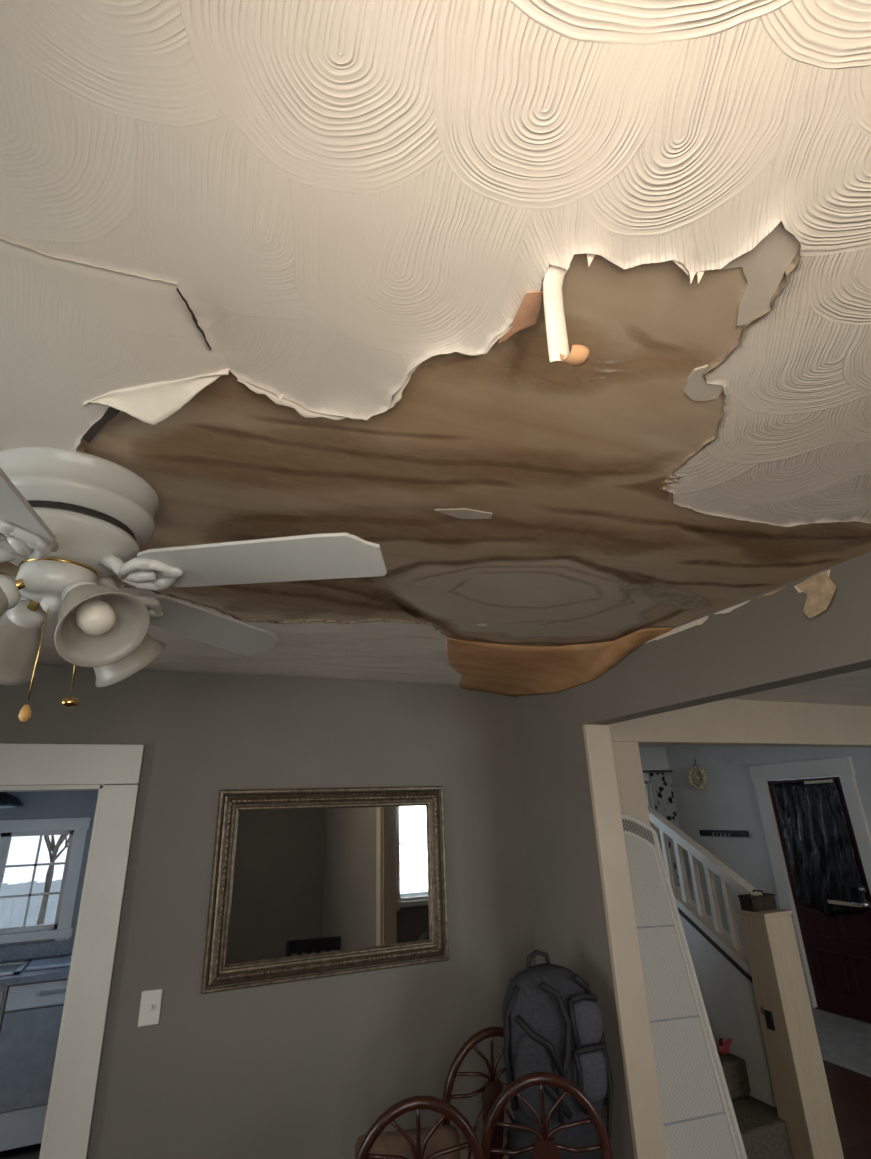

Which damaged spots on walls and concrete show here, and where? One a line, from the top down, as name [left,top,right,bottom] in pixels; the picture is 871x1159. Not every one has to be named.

crack [0,236,211,350]
peeling [689,271,704,284]
peeling [434,508,492,519]
water stain [295,557,714,645]
peeling [794,570,837,619]